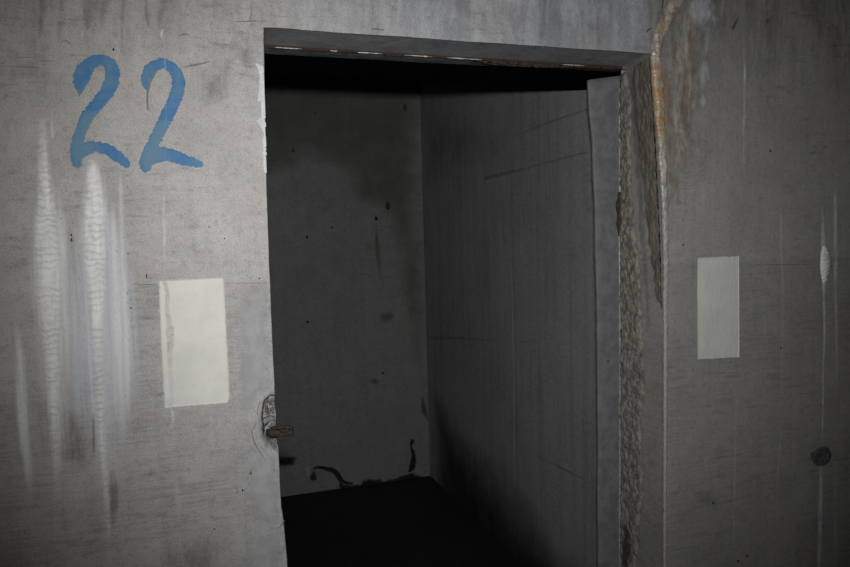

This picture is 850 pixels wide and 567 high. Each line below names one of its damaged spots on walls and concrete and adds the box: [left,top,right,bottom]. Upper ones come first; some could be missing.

damp [17,341,29,474]
damp [35,144,130,473]
spalling [611,57,662,567]
damp [820,194,837,389]